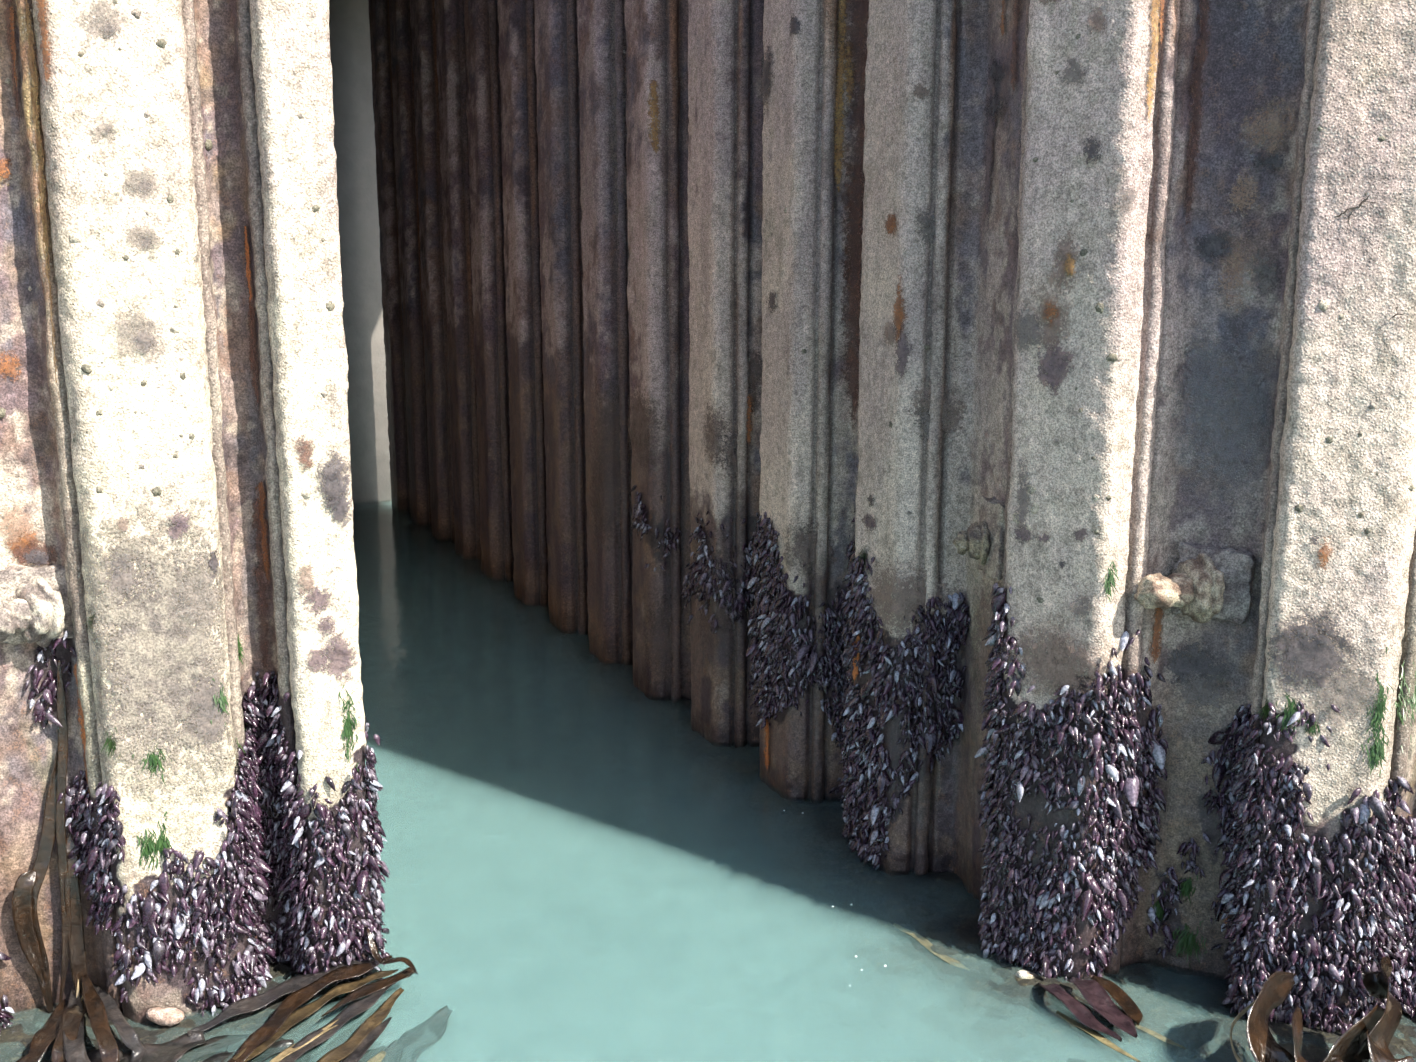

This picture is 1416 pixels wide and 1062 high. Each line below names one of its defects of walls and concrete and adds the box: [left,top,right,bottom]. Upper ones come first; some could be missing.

corrosion [1146,0,1164,123]
corrosion [1184,0,1210,224]
corrosion [0,0,60,401]
corrosion [834,0,869,430]
corrosion [884,214,897,234]
corrosion [244,227,259,404]
corrosion [884,277,912,383]
corrosion [0,505,38,565]
corrosion [252,482,270,669]
corrosion [73,662,90,794]
damp [1267,606,1382,730]